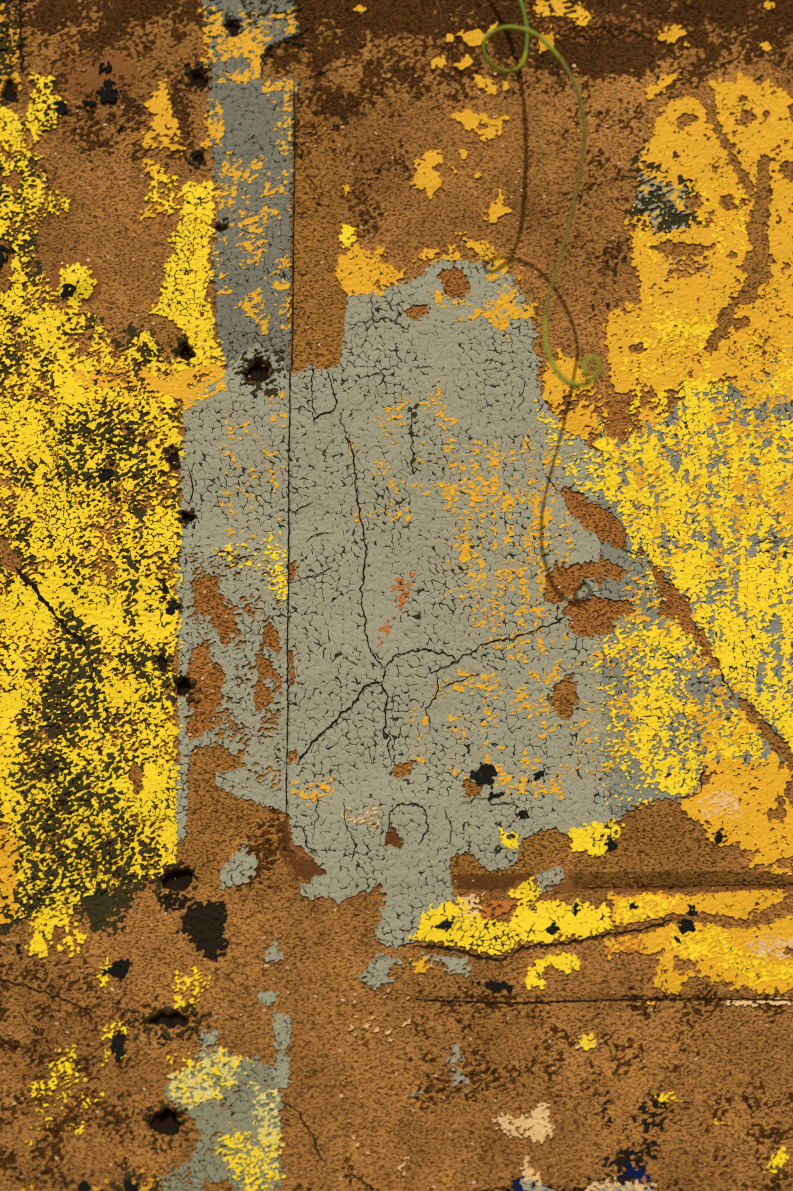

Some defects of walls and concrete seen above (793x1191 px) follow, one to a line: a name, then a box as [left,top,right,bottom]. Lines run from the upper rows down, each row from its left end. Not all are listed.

crack [0,256,89,346]
spalling [652,102,793,356]
crack [0,354,168,566]
crack [71,0,793,987]
spalling [543,486,720,669]
crack [0,656,42,718]
crack [1,763,65,830]
spalling [184,575,238,740]
spalling [181,746,324,895]
spalling [448,802,793,939]
spalling [729,691,793,823]
crack [414,934,793,1004]